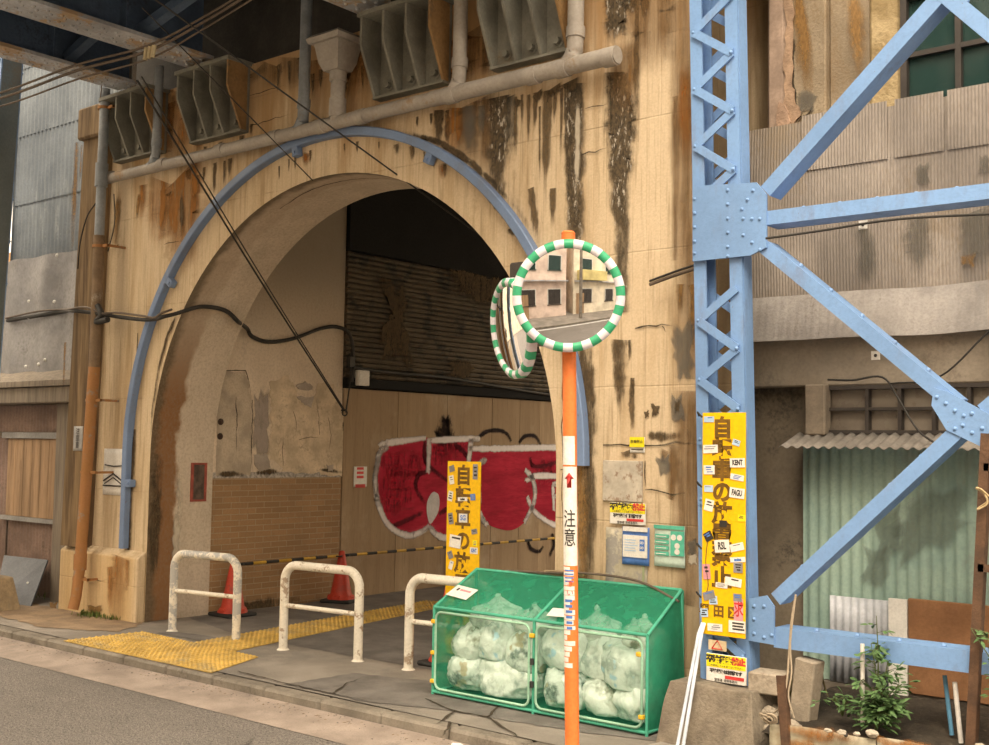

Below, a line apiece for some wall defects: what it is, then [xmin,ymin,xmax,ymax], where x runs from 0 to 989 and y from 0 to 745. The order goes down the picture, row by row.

rust [139,163,200,242]
damp [410,77,585,240]
damp [604,0,643,312]
peeling [216,371,344,477]
rust [878,736,925,745]